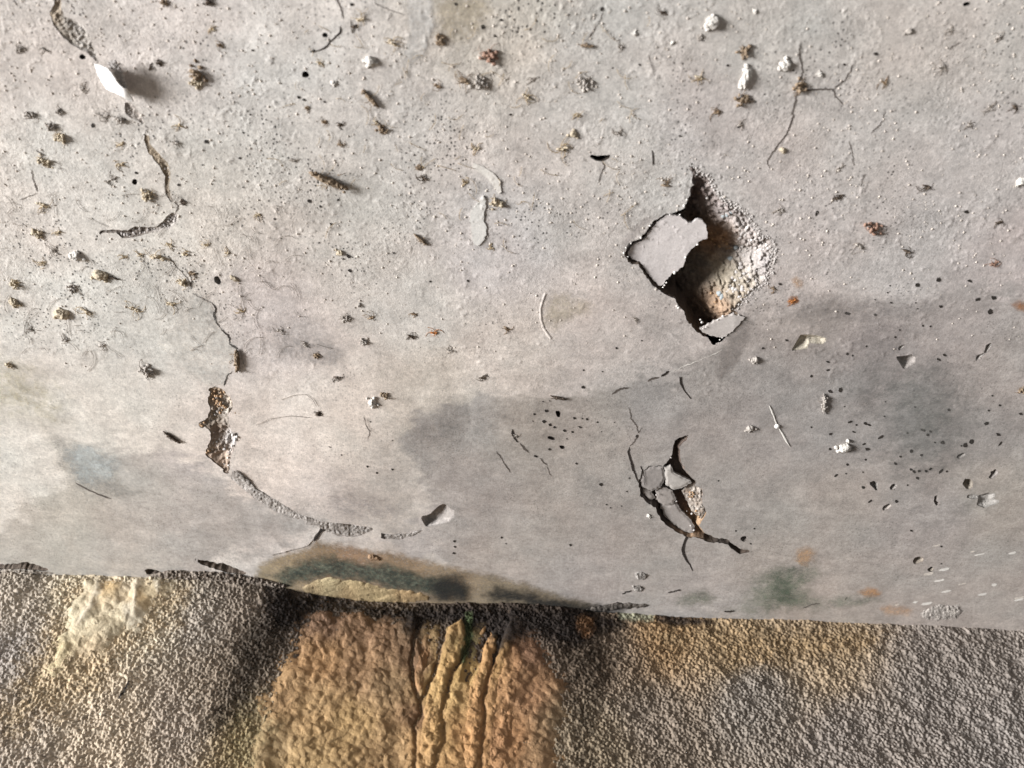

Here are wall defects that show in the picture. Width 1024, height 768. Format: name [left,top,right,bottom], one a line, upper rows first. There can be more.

crack [50,0,99,63]
crack [95,103,178,240]
spalling [623,165,778,341]
crack [767,43,853,168]
flaking render [188,386,454,556]
crack [612,350,749,593]
damp [211,541,623,768]